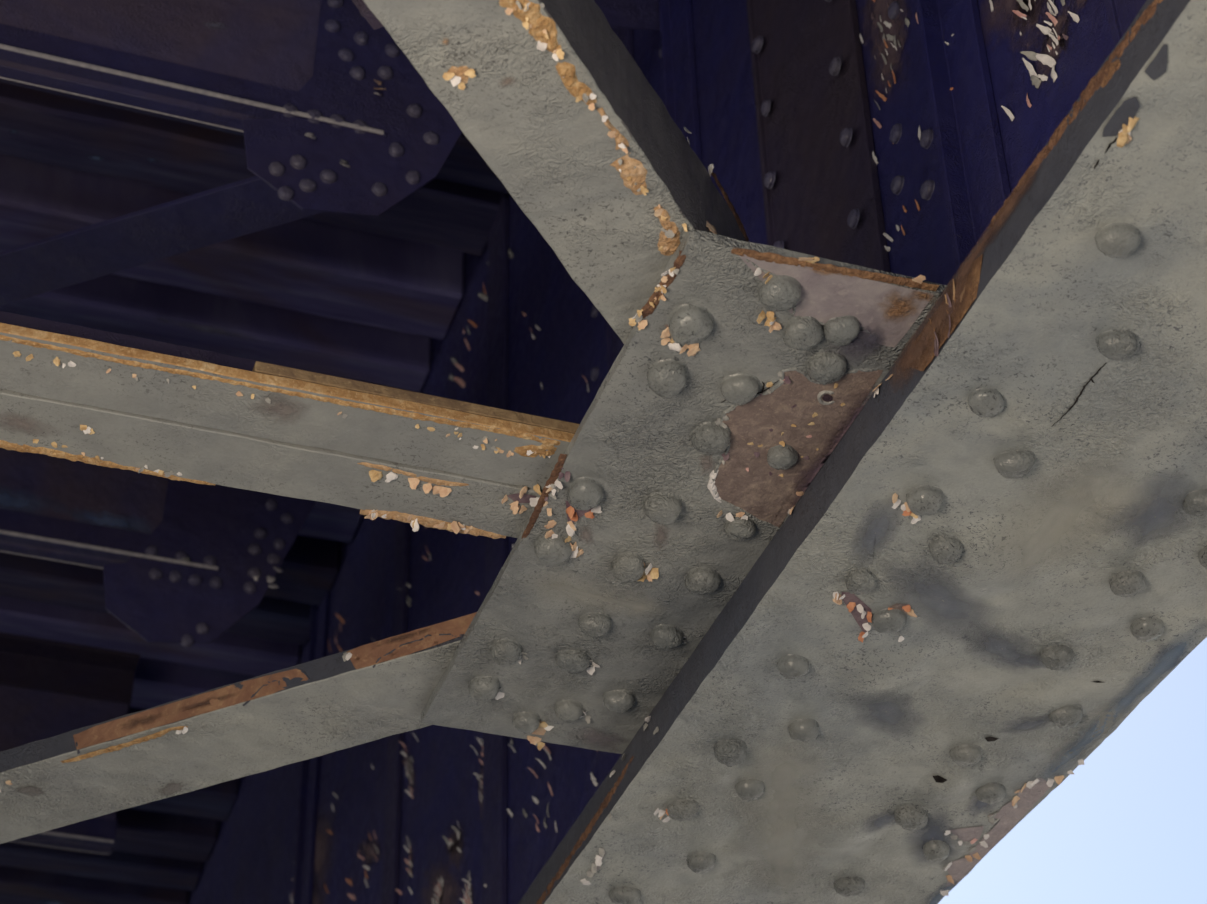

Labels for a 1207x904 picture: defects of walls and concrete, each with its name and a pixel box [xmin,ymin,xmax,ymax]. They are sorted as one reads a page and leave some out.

peeling [988,0,1085,108]
rust [708,0,1163,377]
peeling [449,357,465,388]
crack [1051,363,1106,427]
peeling [707,367,893,528]
peeling [357,462,468,497]
peeling [544,501,602,558]
peeling [833,592,872,643]
peeling [888,603,917,617]
rust [61,726,188,763]
peeling [940,759,1084,896]